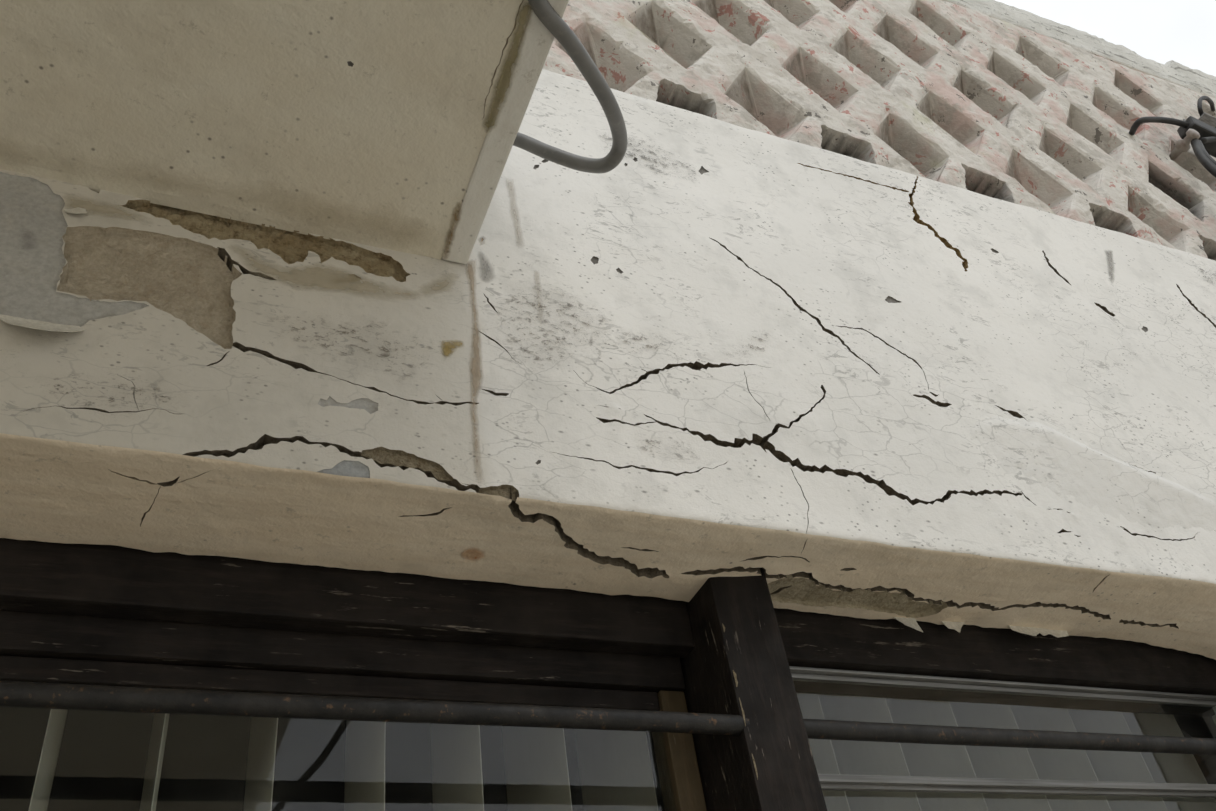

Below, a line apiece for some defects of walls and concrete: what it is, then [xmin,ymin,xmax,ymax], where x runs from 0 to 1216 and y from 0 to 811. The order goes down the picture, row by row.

crack [798,163,968,271]
spalling [0,172,410,349]
crack [1042,251,1071,285]
crack [479,294,521,364]
crack [710,238,952,407]
crack [1094,302,1115,317]
crack [1176,284,1216,328]
crack [207,342,509,406]
crack [110,361,1179,629]
peeling [1008,625,1069,638]